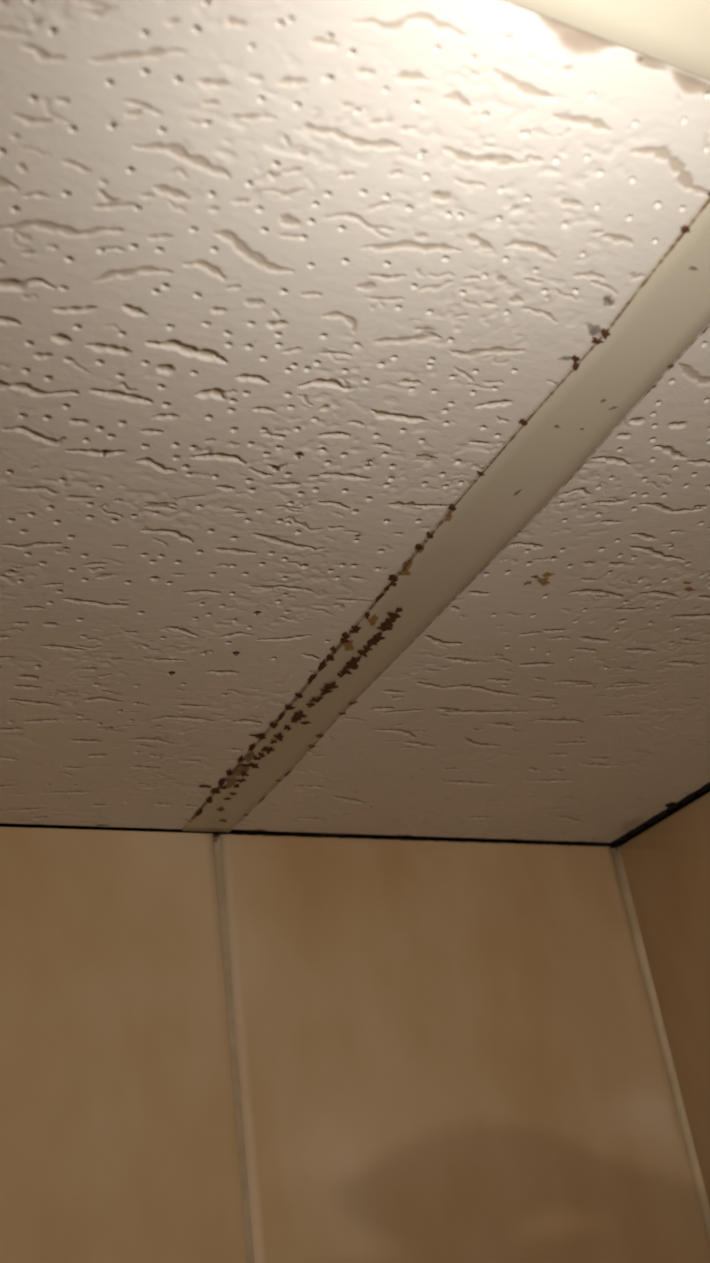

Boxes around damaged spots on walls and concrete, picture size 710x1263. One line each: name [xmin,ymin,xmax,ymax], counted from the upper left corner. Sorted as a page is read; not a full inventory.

rust [190,192,710,824]